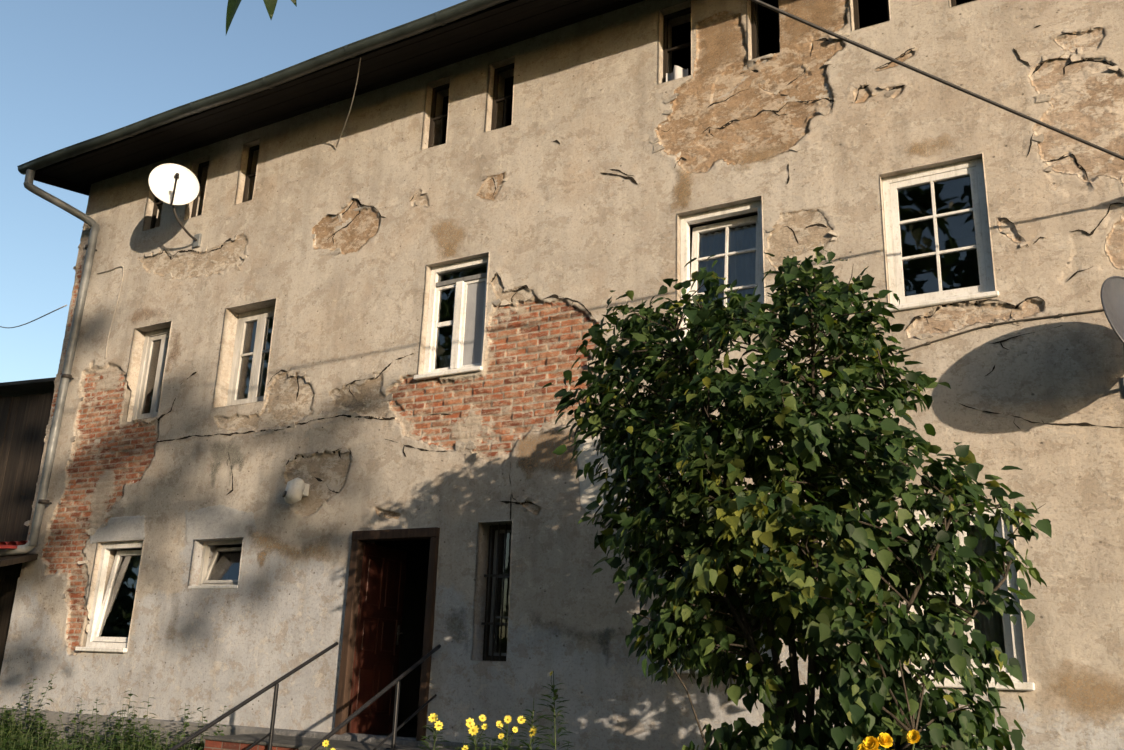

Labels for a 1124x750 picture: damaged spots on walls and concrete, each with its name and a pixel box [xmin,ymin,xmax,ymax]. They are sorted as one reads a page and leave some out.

spalling [650,0,850,174]
crack [1013,18,1124,75]
spalling [1028,27,1124,185]
spalling [138,233,248,281]
spalling [309,195,380,255]
spalling [765,209,844,272]
flaking render [24,226,91,541]
flaking render [40,360,159,656]
crack [94,350,445,495]
spalling [281,446,352,517]
flaking render [329,273,608,467]
crack [952,401,1124,430]